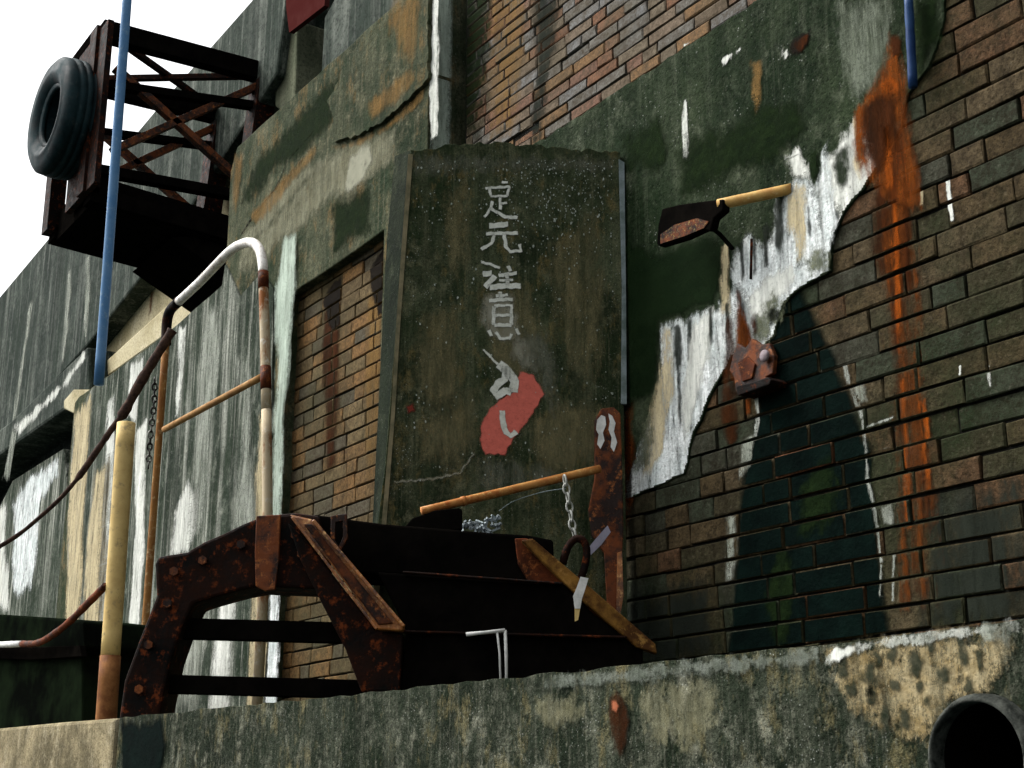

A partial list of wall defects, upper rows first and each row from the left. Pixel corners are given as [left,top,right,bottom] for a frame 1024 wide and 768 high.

flaking render [240,101,414,271]
damp [0,460,58,612]
damp [4,273,85,476]
damp [66,395,115,621]
damp [129,359,147,624]
damp [170,308,222,555]
damp [234,236,295,527]
peeling [738,356,756,382]
damp [626,120,876,498]
rust [854,35,938,609]
damp [183,640,230,676]
damp [249,642,280,678]